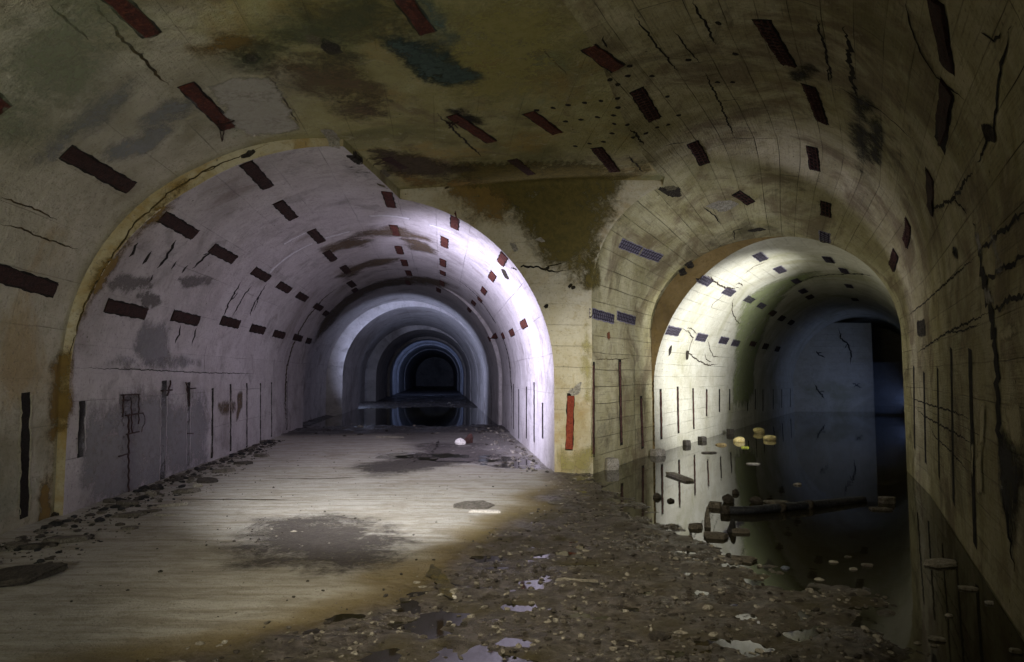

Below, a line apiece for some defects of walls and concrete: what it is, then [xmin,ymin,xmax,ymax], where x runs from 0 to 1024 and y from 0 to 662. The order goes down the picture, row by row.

crack [51,2,169,85]
damp [231,0,558,119]
damp [849,92,884,173]
crack [69,144,267,374]
damp [367,149,650,290]
crack [910,27,1024,456]
crack [682,328,739,377]